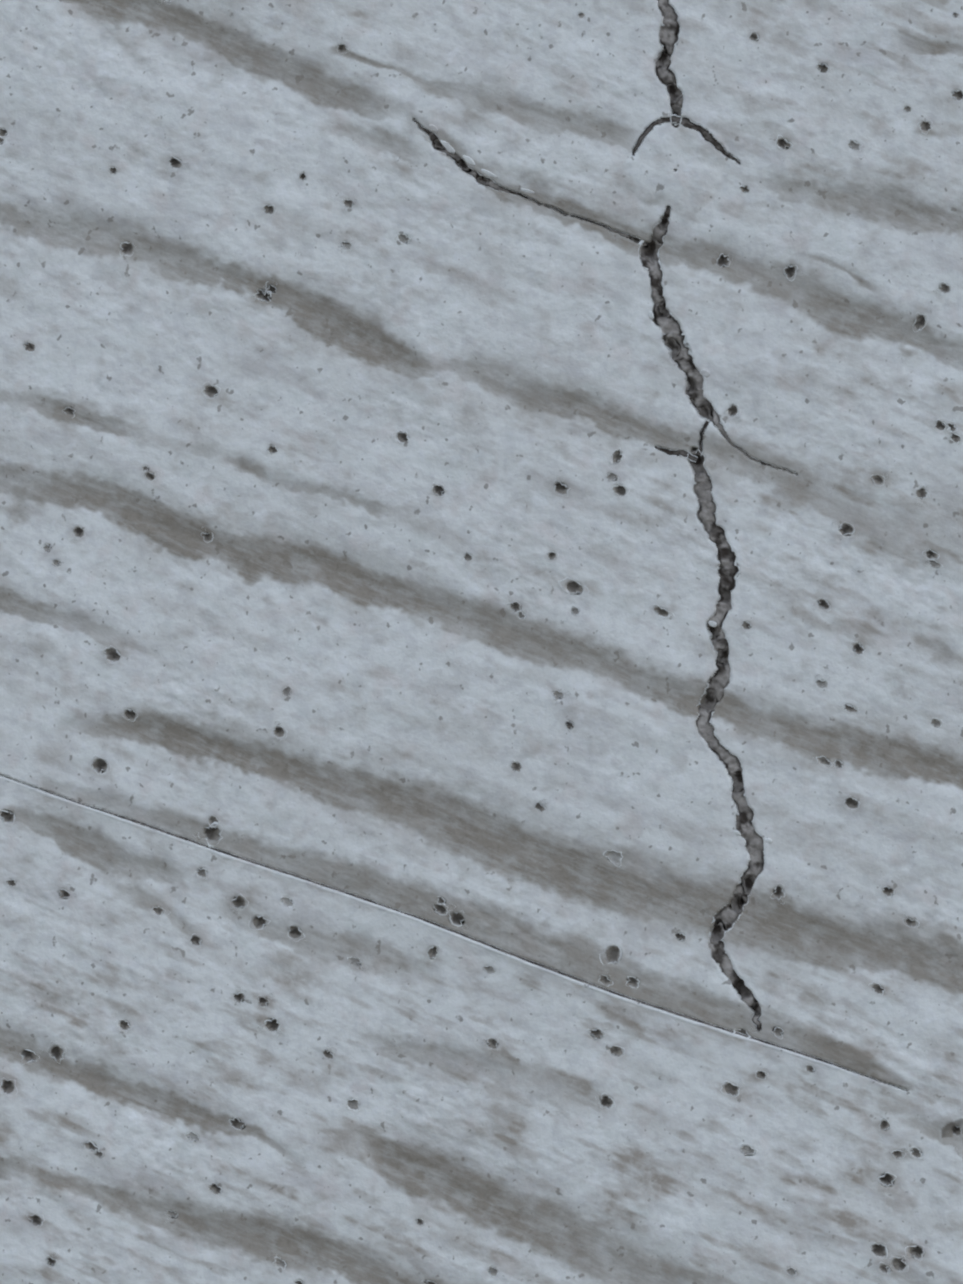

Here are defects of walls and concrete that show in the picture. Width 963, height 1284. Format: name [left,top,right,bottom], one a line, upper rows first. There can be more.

crack [632,0,741,164]
crack [0,120,906,1090]